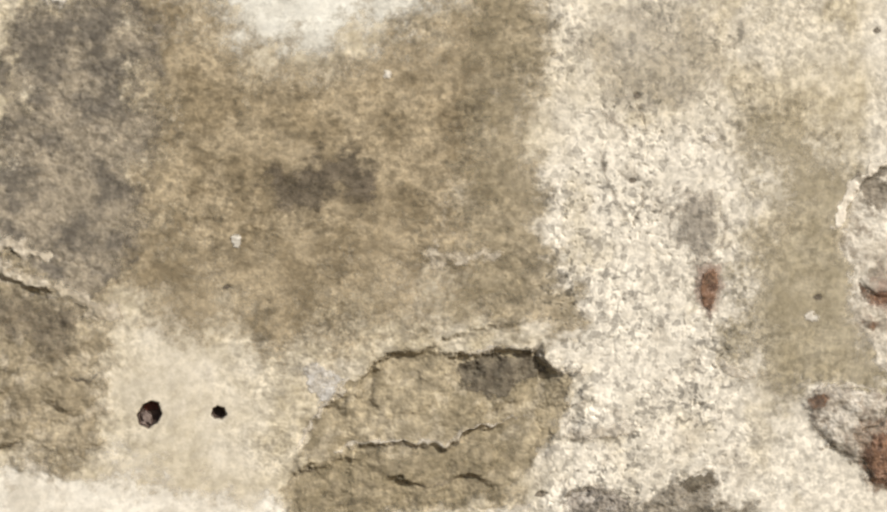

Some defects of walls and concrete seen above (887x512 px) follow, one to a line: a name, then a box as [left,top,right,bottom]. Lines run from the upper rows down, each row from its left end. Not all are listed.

peeling [206,0,437,64]
leakage [0,0,589,355]
corrosion [701,269,718,311]
leakage [716,100,887,396]
spalling [831,160,887,371]
corrosion [860,284,887,305]
spalling [0,344,637,512]